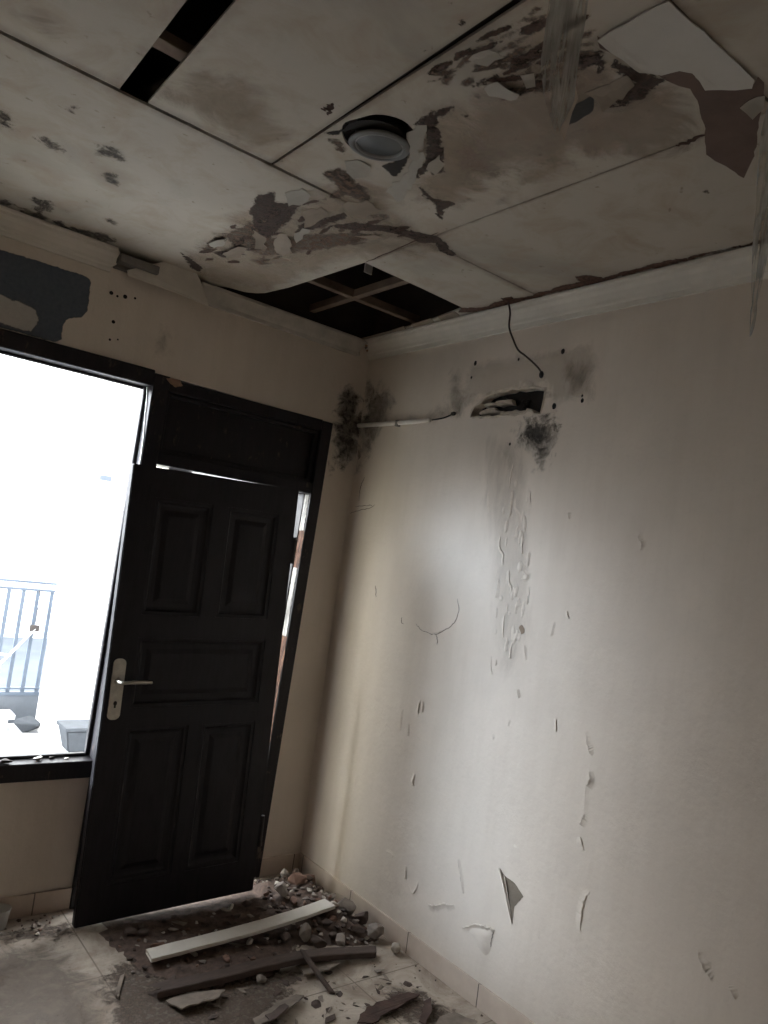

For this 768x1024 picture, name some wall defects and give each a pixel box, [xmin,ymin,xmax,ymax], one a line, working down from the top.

peeling [468,50,504,67]
peeling [484,73,535,101]
peeling [209,188,329,260]
peeling [0,250,91,342]
hole [470,386,547,419]
mould [333,389,386,470]
mould [521,414,558,452]
crack [401,599,459,643]
peeling [498,868,523,923]